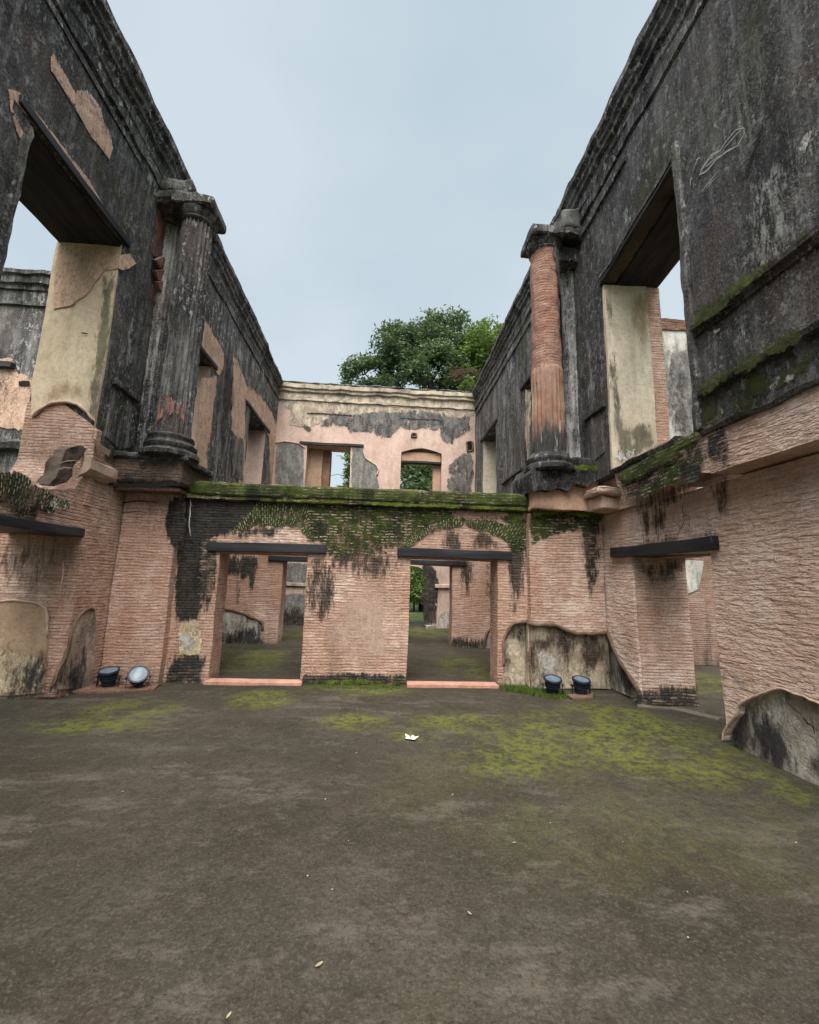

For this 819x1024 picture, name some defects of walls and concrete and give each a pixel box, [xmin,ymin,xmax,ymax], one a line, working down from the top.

spalling [9,89,103,204]
spalling [51,54,113,159]
spalling [53,237,136,310]
spalling [154,320,276,485]
leakage [622,344,728,543]
leakage [185,499,278,611]
leakage [8,652,46,698]